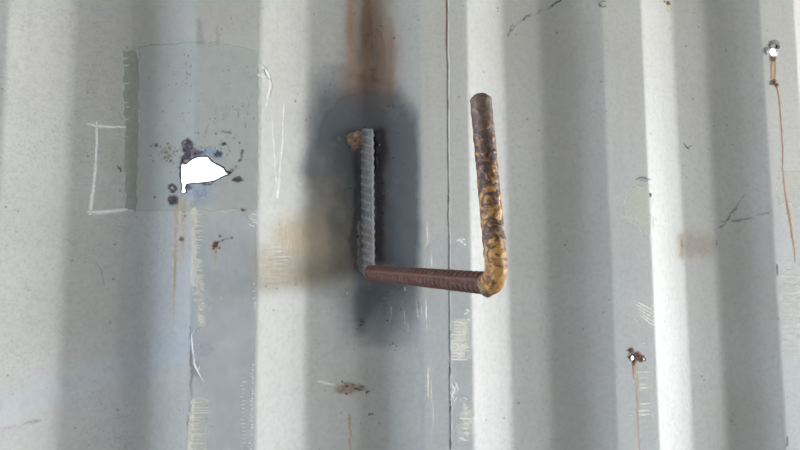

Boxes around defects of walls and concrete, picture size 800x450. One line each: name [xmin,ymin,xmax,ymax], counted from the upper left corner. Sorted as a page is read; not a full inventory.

rust [355,0,395,88]
rust [770,56,795,257]
rust [318,380,369,395]
rust [628,348,644,389]